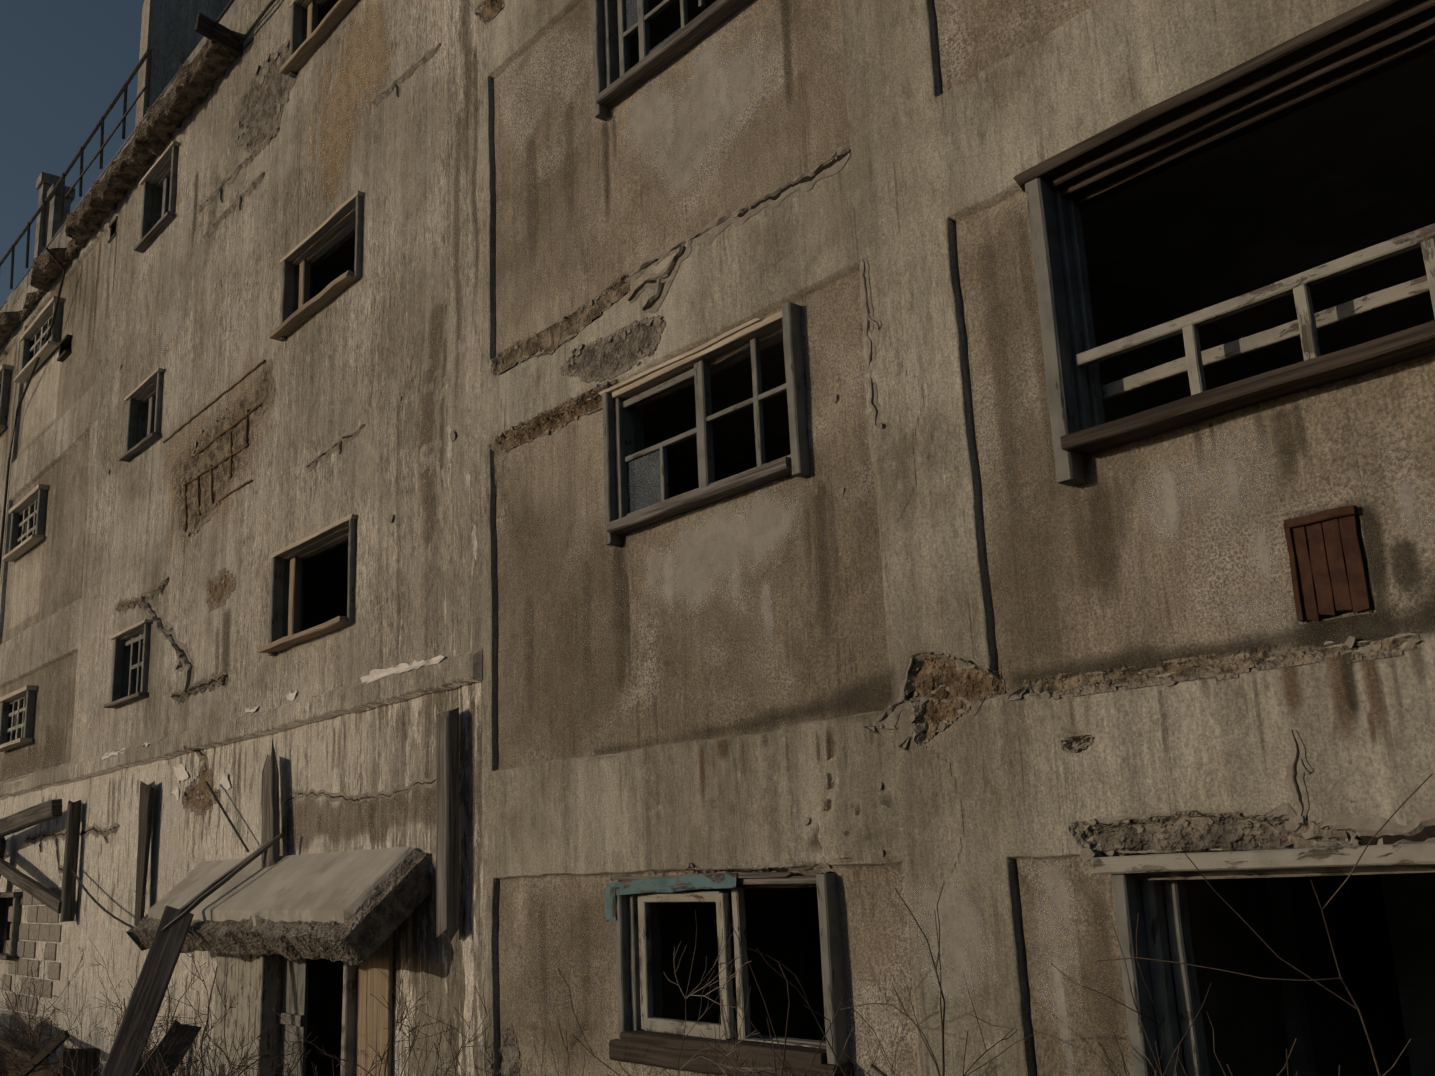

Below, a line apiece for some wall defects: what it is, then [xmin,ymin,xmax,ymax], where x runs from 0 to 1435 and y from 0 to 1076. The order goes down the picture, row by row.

damp [421,0,477,516]
crack [626,147,850,313]
spalling [491,273,665,453]
spalling [162,359,275,538]
crack [116,576,228,705]
spalling [170,743,231,816]
damp [611,551,629,667]
damp [742,679,892,728]
spalling [1061,734,1094,753]
spalling [863,631,1422,750]
spalling [1068,810,1361,862]